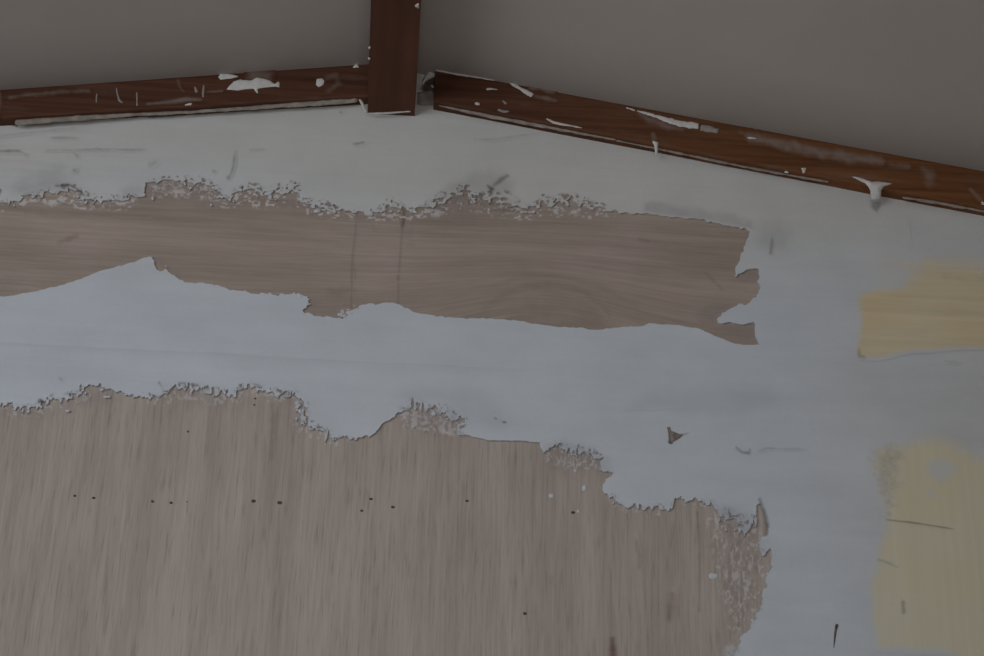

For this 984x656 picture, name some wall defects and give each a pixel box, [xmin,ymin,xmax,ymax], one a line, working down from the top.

flaking render [0,174,760,345]
flaking render [854,246,984,361]
flaking render [0,380,772,656]
flaking render [862,430,984,656]